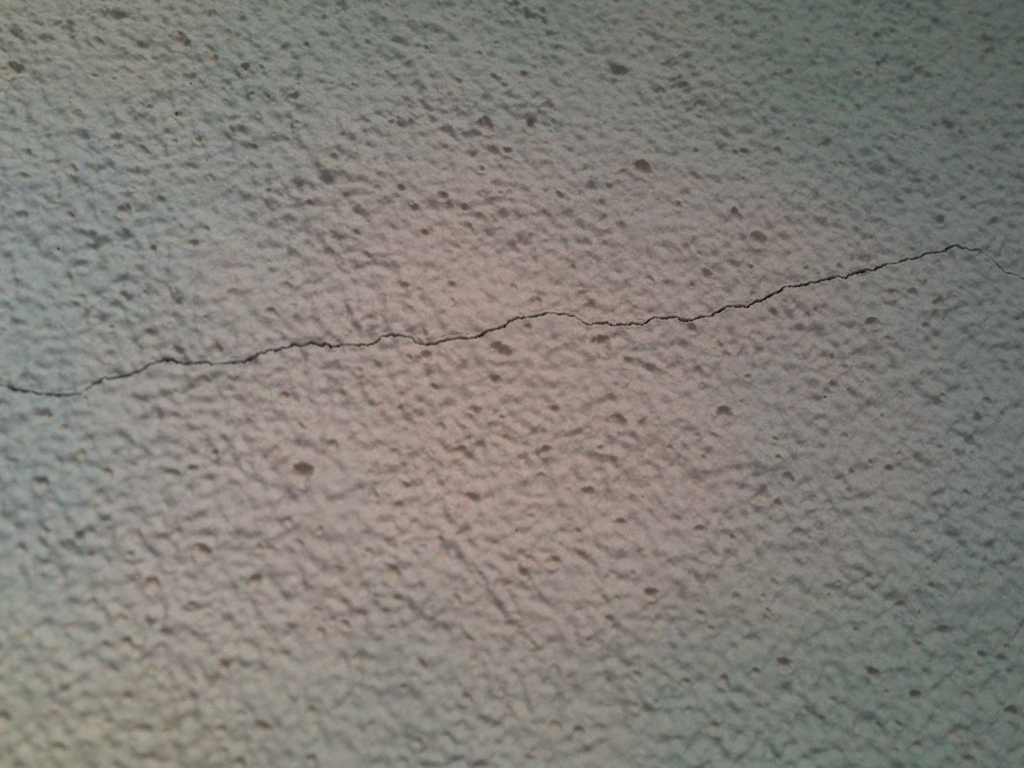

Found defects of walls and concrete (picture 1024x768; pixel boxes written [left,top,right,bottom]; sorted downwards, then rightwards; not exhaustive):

crack [0,241,1024,407]